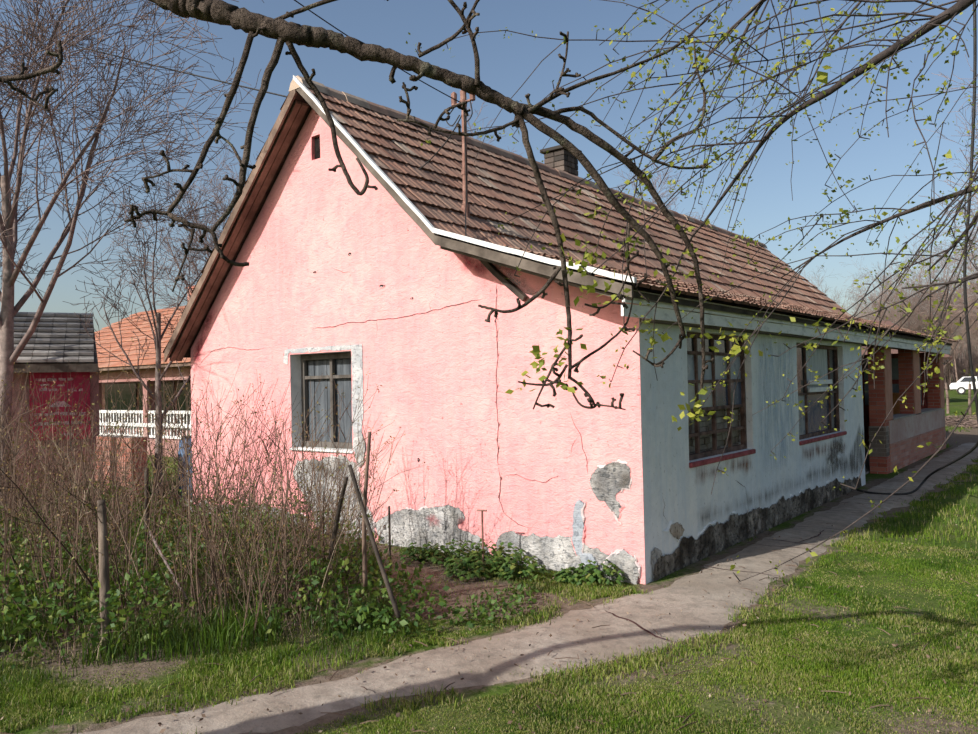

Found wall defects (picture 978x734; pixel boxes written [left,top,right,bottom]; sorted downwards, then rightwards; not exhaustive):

spalling [223,431,633,578]
crack [313,284,558,530]
crack [570,412,589,474]